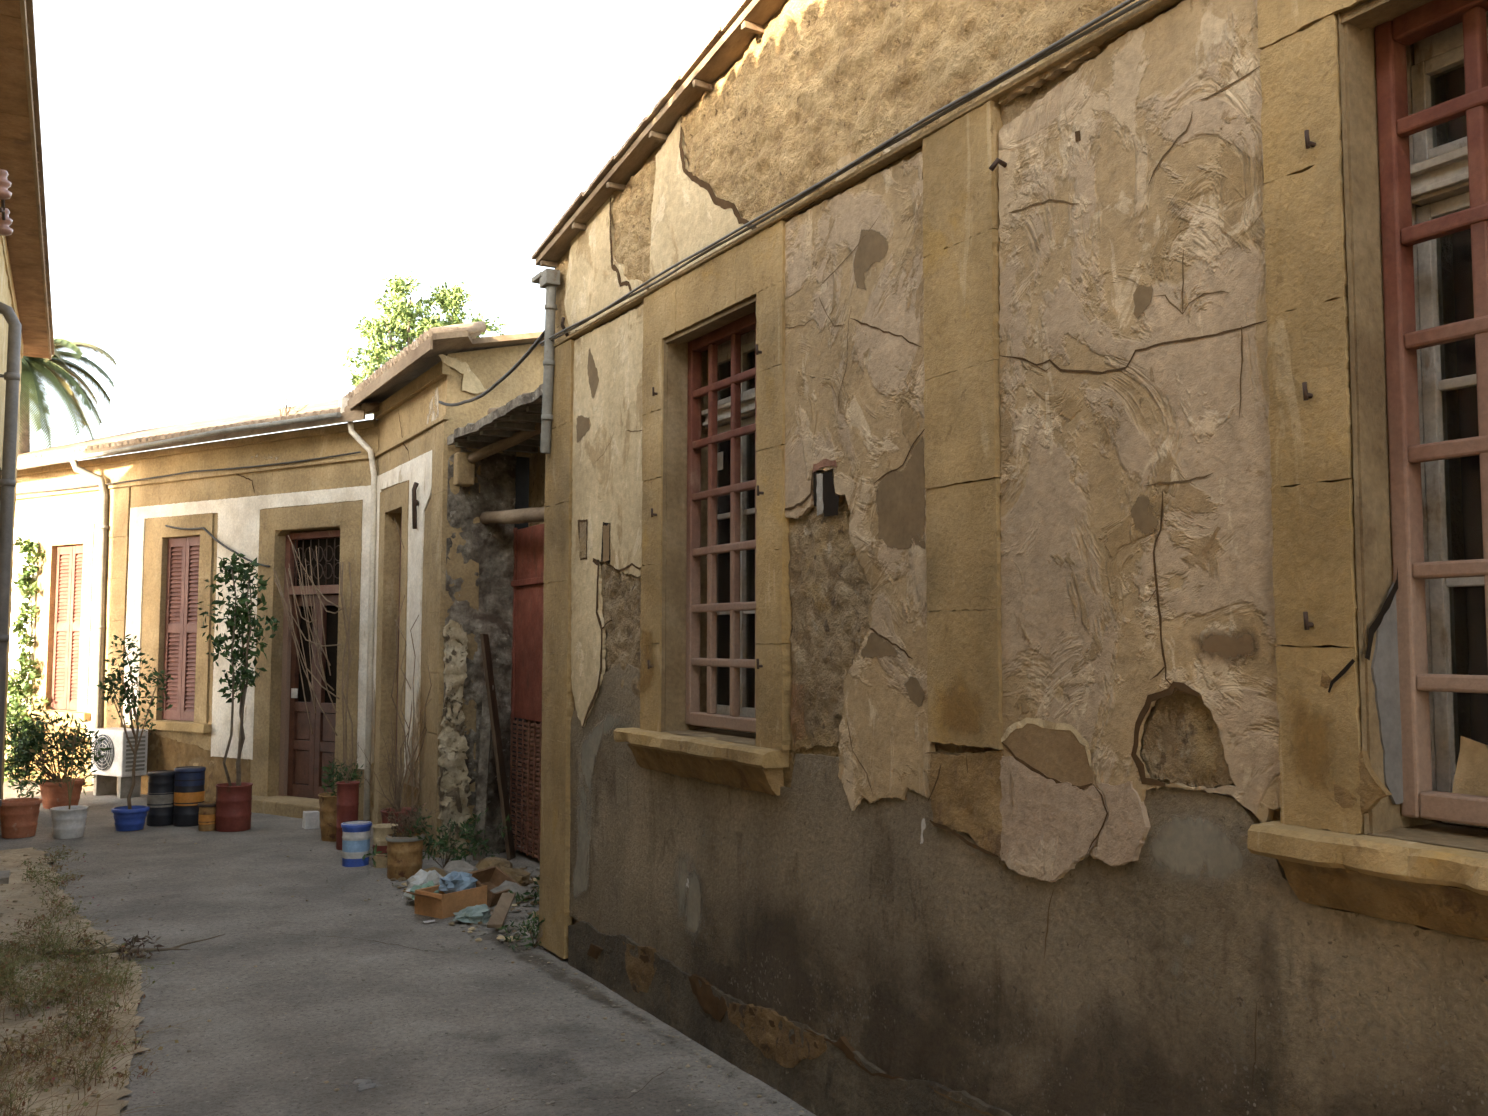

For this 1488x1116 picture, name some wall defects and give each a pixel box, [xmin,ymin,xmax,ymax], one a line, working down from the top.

crack [785,218,921,419]
peeling [854,230,888,290]
crack [1000,249,1267,416]
peeling [876,436,926,549]
spalling [601,563,641,698]
peeling [904,676,924,707]
crack [1145,473,1212,687]
peeling [929,681,1235,882]
spalling [688,974,805,1068]
water stain [688,822,1488,1116]